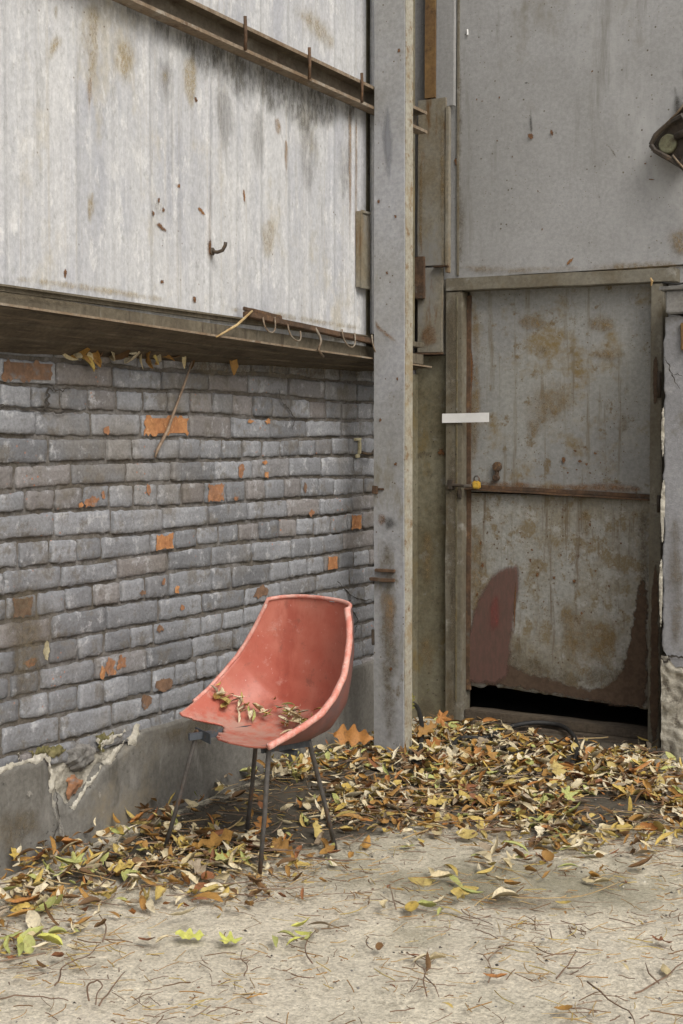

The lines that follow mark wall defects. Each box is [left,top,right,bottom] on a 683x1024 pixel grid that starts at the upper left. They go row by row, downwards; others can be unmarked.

leakage [156,20,354,130]
spalling [1,358,53,383]
spalling [144,415,189,436]
spalling [208,483,238,502]
corrosion [466,296,659,742]
spalling [156,532,174,551]
spalling [0,723,140,810]